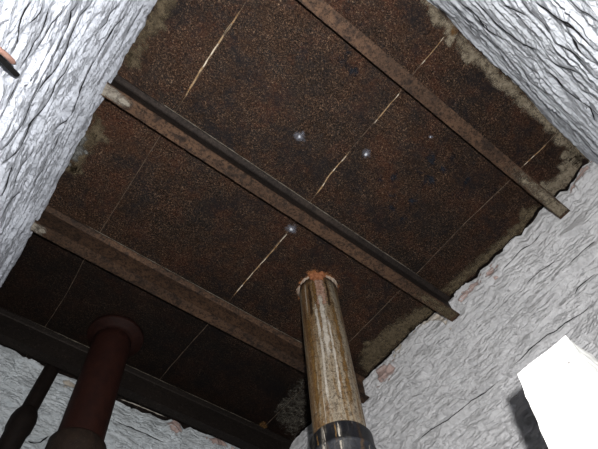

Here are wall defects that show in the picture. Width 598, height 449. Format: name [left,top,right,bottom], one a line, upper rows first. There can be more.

rust [186,13,239,95]
damp [421,1,589,295]
rust [296,269,339,299]
damp [359,294,456,375]